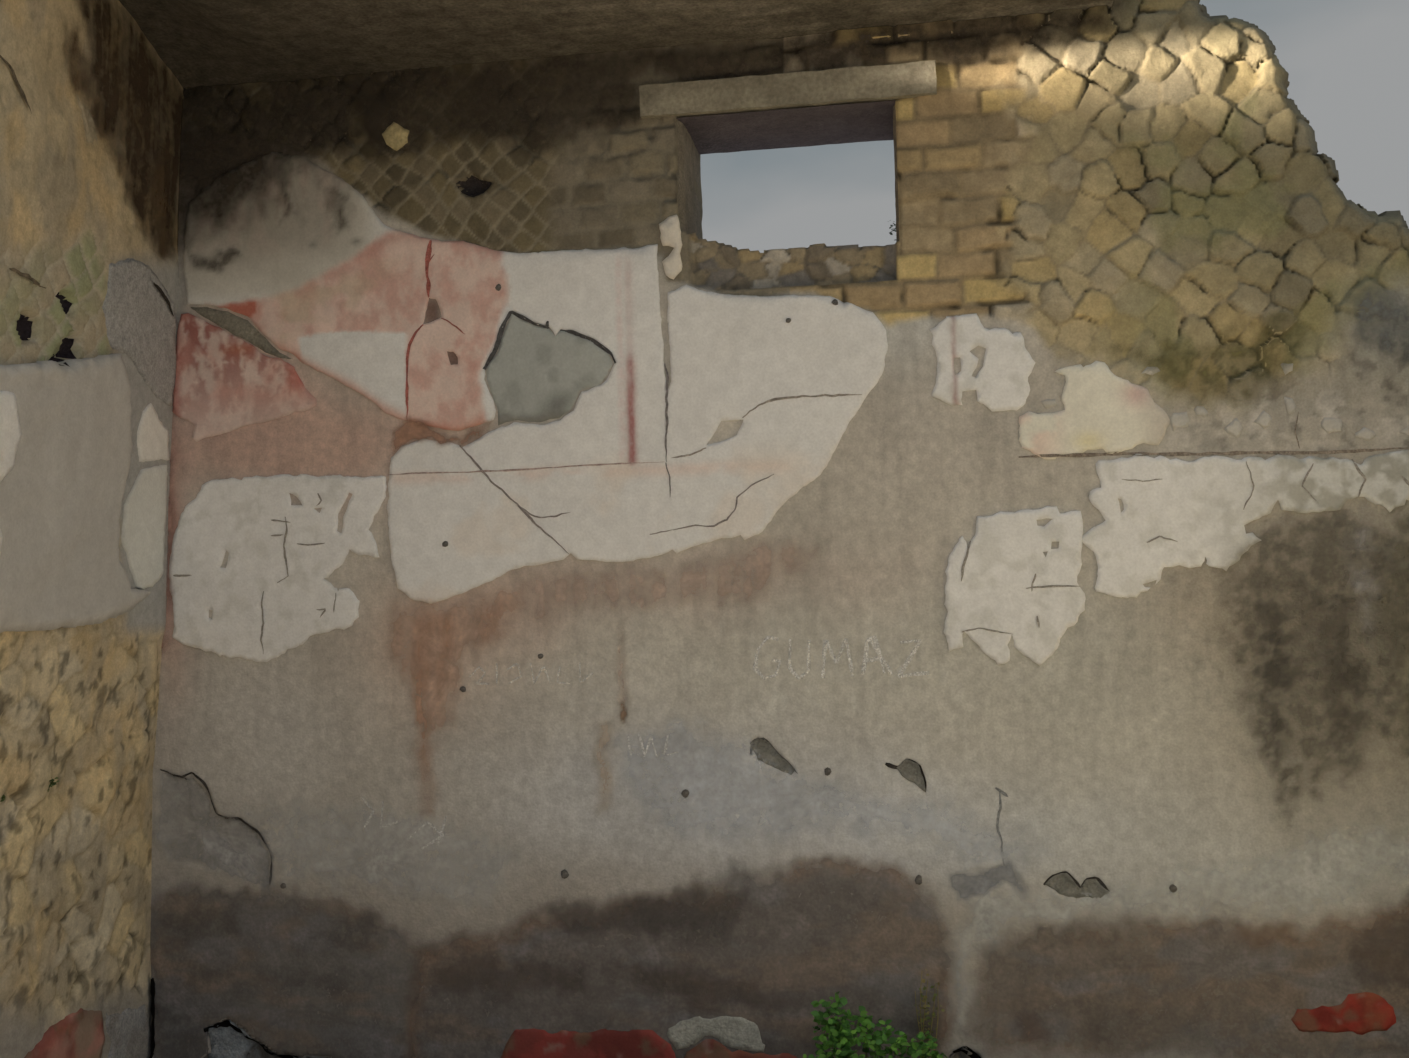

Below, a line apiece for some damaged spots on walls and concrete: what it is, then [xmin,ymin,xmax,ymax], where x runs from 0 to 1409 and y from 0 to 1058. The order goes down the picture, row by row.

crack [405,240,464,418]
crack [388,363,706,554]
spalling [482,311,616,425]
crack [650,474,774,535]
crack [740,394,862,421]
leakage [1236,520,1409,793]
spalling [750,737,798,775]
spalling [885,759,927,792]
spalling [1043,871,1110,899]
leakage [150,857,953,1058]
leakage [975,900,1409,1058]
spalling [950,1046,981,1058]